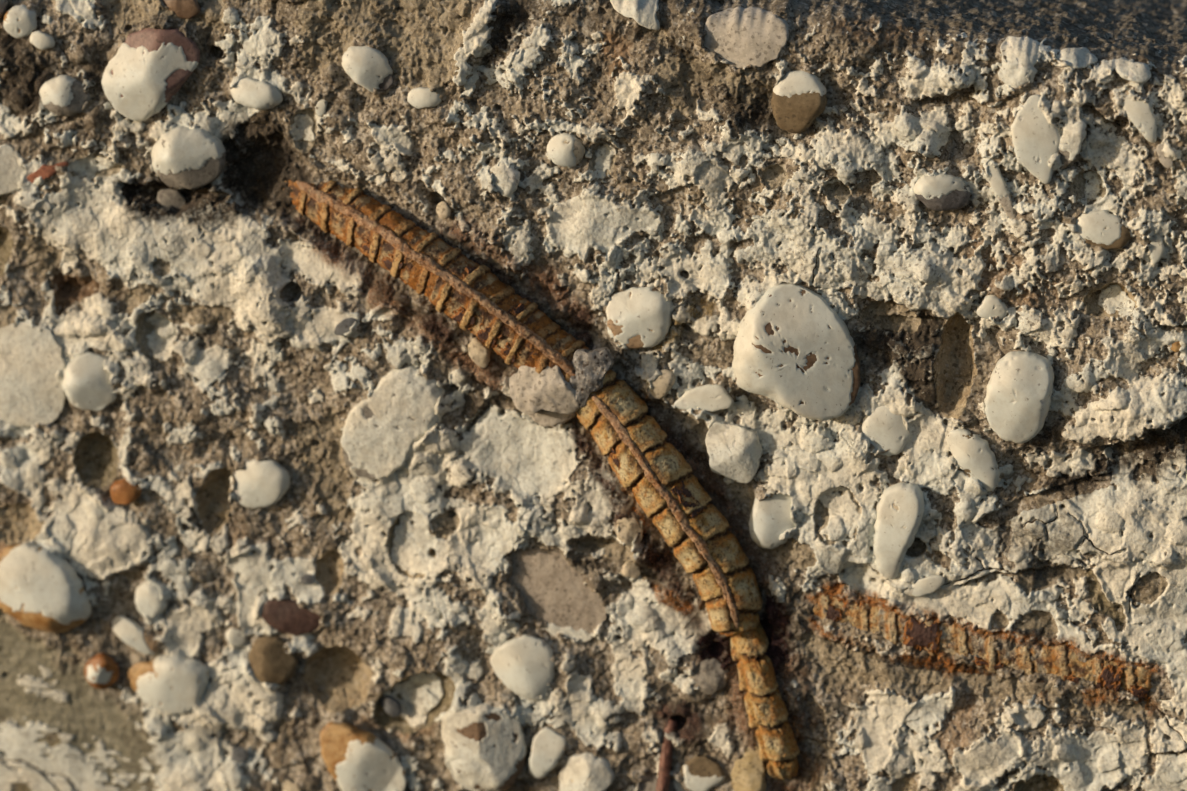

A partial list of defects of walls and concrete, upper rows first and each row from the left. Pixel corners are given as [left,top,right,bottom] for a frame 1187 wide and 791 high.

peeling [17,169,405,359]
rust [283,180,592,390]
rust [653,300,713,349]
peeling [753,207,987,322]
peeling [1062,328,1187,445]
peeling [0,431,158,580]
peeling [0,542,325,791]
peeling [286,405,628,590]
rust [570,370,811,789]
peeling [640,395,882,578]
rust [807,582,1159,711]
peeling [795,402,1187,791]